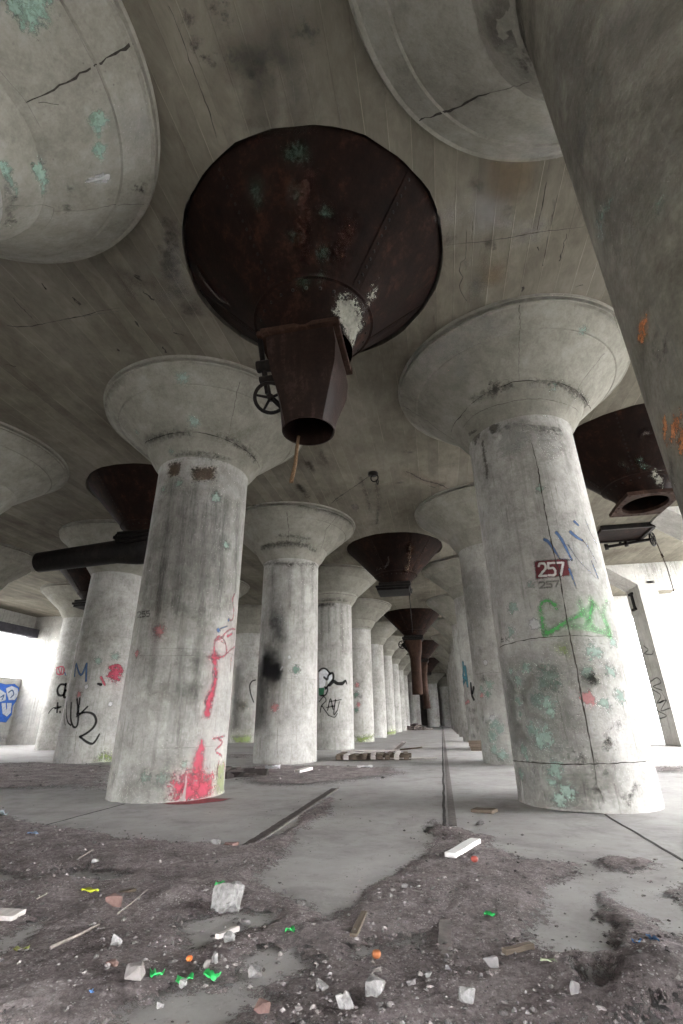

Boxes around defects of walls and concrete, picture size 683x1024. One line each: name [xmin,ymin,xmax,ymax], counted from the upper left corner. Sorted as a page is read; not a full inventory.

crack [0,13,130,125]
crack [419,82,528,121]
rust [168,460,216,482]
crack [501,443,650,802]